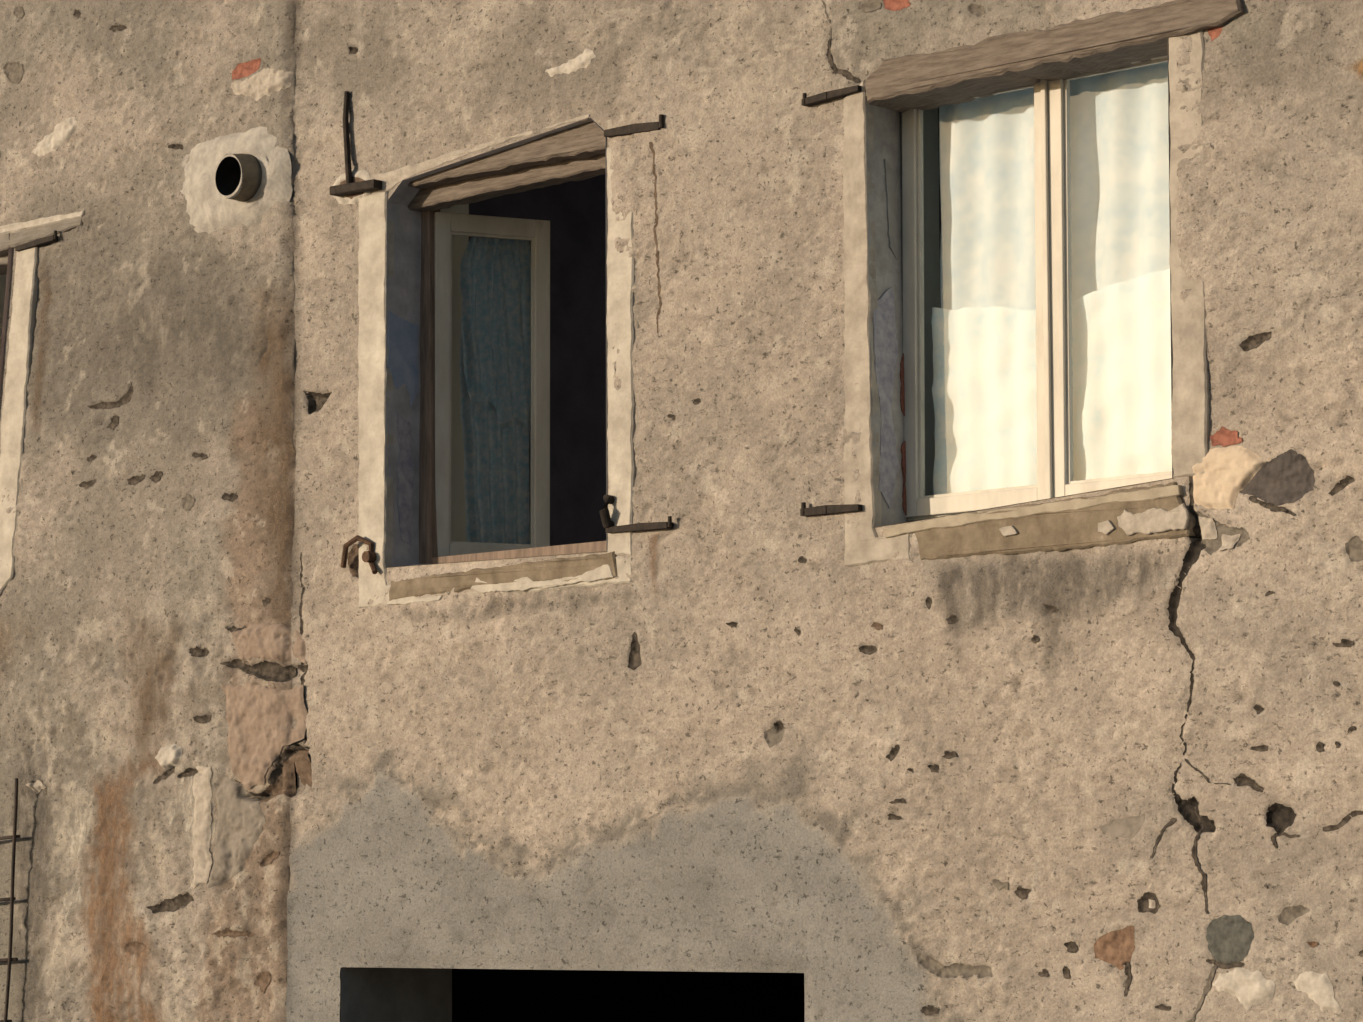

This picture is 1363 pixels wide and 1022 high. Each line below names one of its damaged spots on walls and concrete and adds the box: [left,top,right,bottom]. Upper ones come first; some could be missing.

crack [821,0,860,83]
flaking render [1239,449,1355,516]
flaking render [189,623,312,802]
crack [1150,534,1230,914]
flaking render [147,766,215,914]
rust [87,763,156,1022]
flaking render [992,879,1030,900]
flaking render [917,955,992,978]
flaking render [1038,941,1078,979]
flaking render [1094,892,1160,997]
crack [1190,965,1217,1022]
flaking render [1206,915,1254,969]